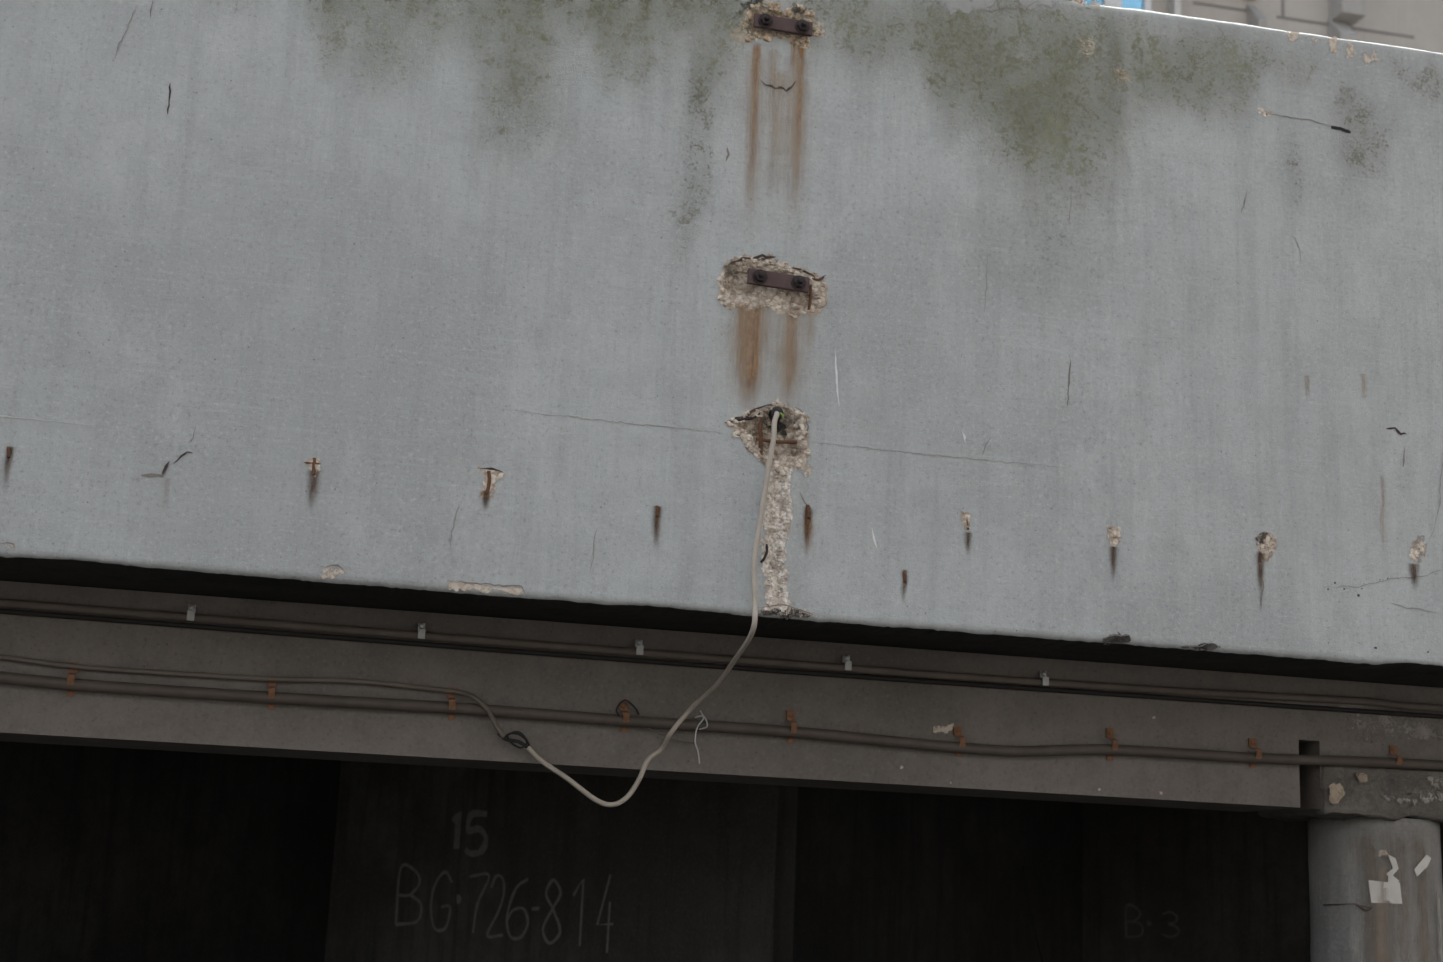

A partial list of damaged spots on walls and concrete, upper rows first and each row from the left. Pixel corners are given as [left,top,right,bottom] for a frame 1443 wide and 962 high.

spalling [728,0,825,50]
rust [752,46,760,150]
rust [793,40,803,139]
spalling [717,253,828,319]
rust [739,307,759,388]
spalling [725,398,815,620]